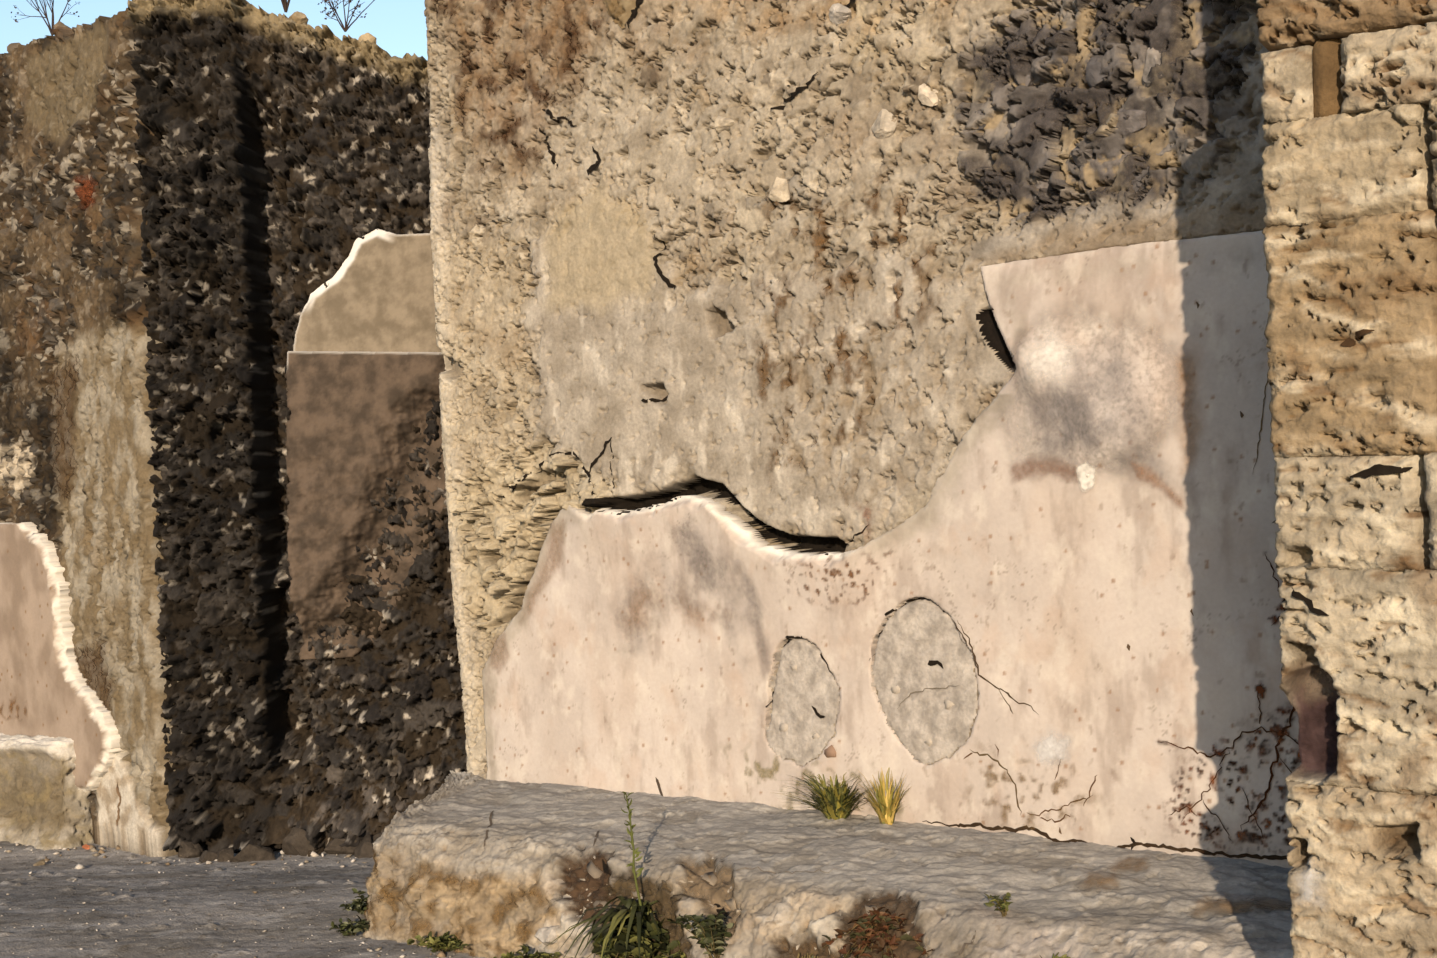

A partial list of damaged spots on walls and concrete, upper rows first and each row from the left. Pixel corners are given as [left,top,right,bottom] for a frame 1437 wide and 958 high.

crack [1253,379,1268,470]
crack [501,437,868,555]
spalling [765,636,840,766]
spalling [869,597,979,765]
crack [957,621,1039,715]